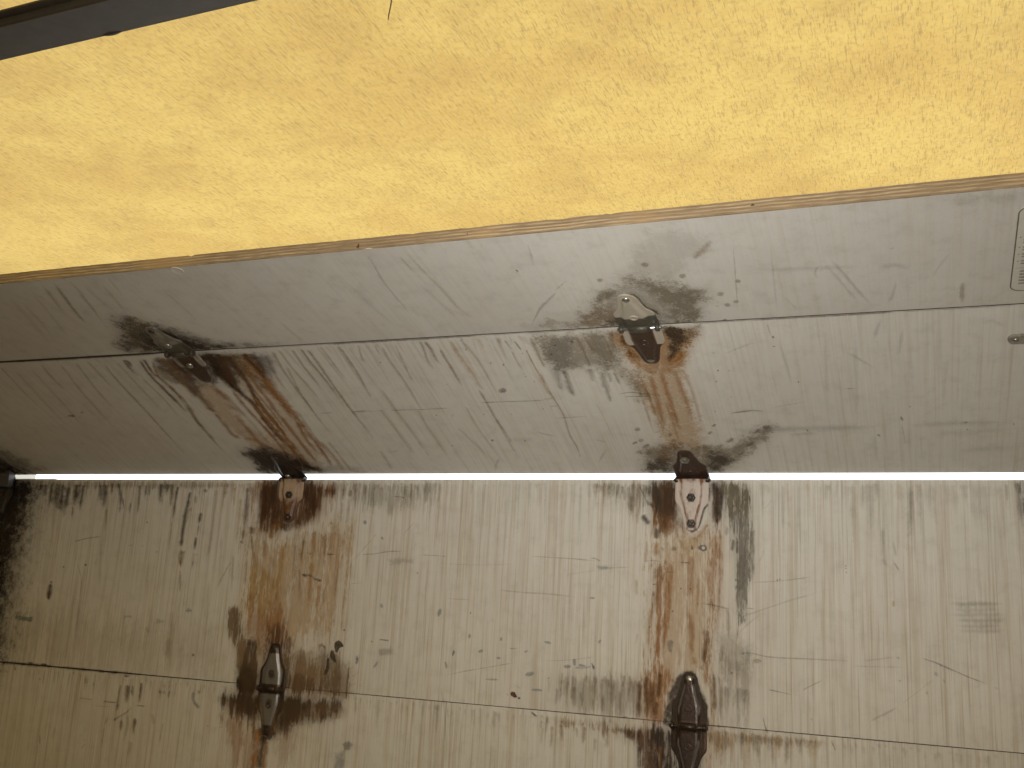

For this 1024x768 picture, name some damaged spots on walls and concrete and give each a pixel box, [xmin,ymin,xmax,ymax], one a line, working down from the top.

rust [128,359,213,427]
rust [200,353,322,455]
rust [614,327,694,418]
rust [251,480,335,537]
rust [643,481,675,538]
rust [690,483,722,536]
rust [649,566,691,652]
rust [221,604,349,768]
rust [624,667,709,768]